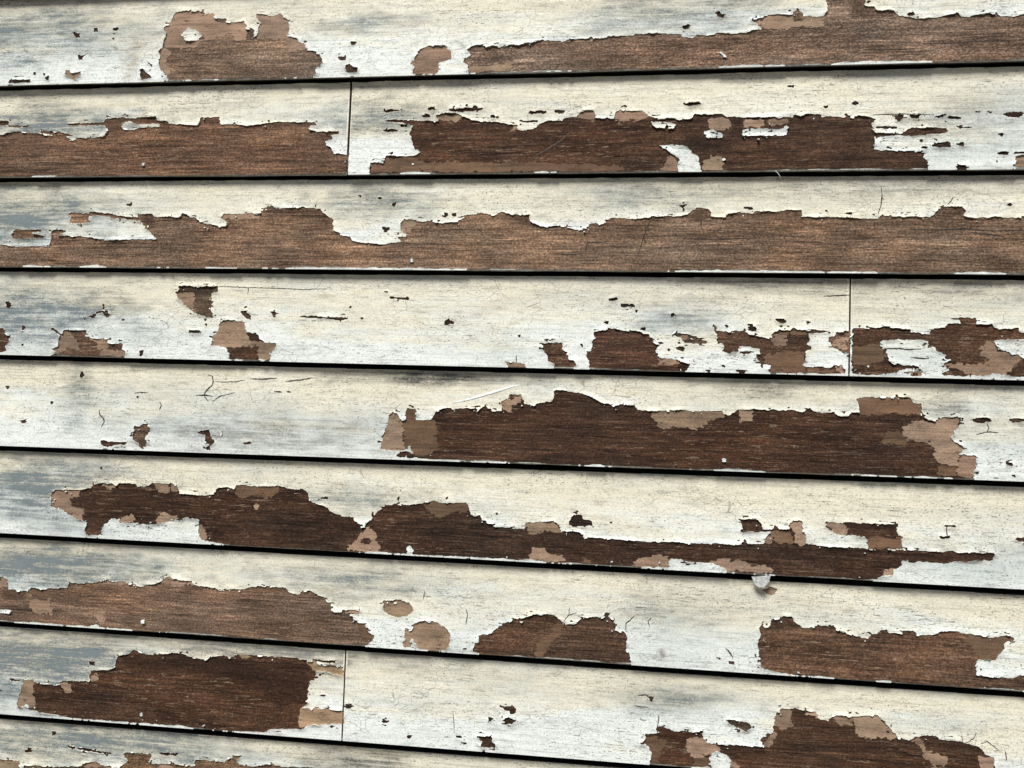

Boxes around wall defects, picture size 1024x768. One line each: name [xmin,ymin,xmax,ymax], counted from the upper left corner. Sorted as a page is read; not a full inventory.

peeling [410,0,1024,74]
peeling [0,116,349,177]
peeling [369,101,972,174]
peeling [0,202,1024,274]
peeling [540,317,1024,377]
peeling [380,390,991,478]
peeling [50,481,996,595]
peeling [0,575,374,645]
peeling [463,612,631,663]
peeling [758,616,1024,690]
peeling [10,650,353,733]
peeling [641,707,995,768]